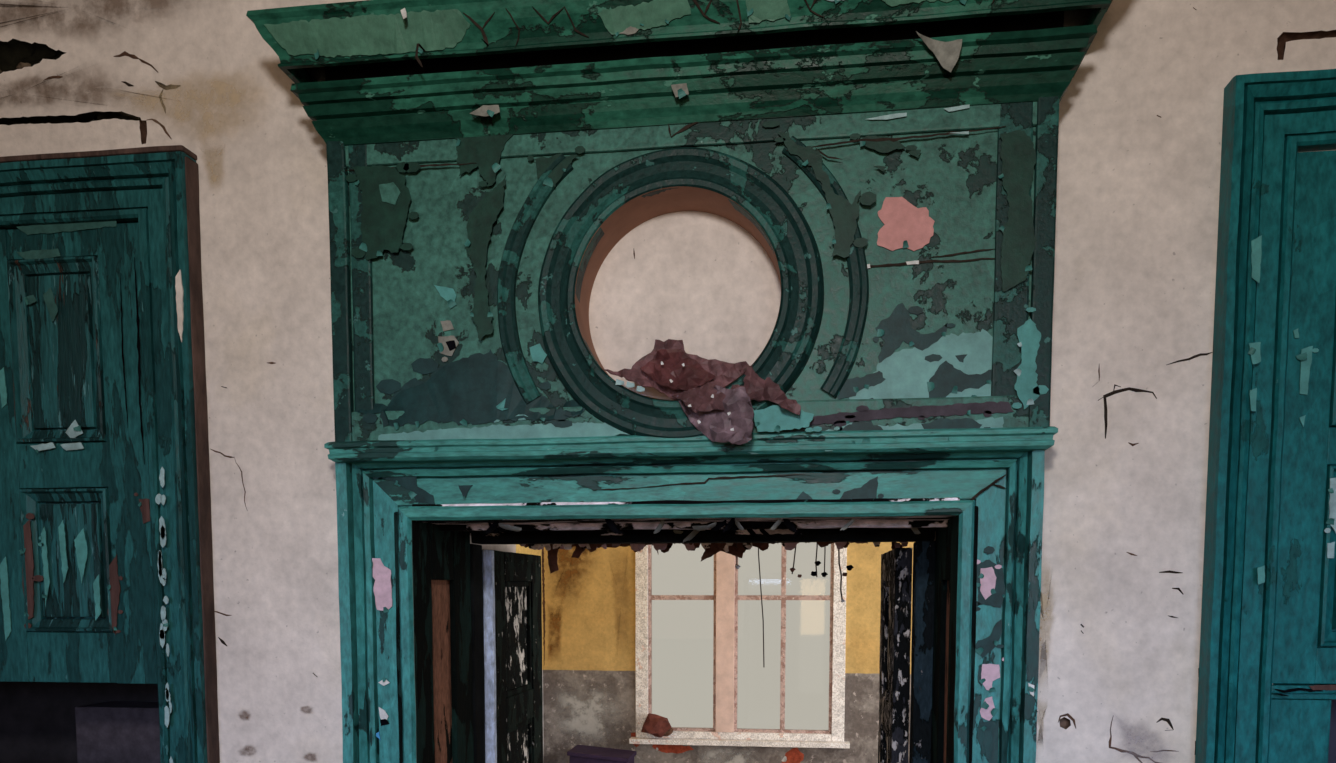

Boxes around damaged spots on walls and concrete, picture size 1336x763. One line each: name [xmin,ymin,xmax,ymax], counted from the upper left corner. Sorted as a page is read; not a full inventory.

crack [464,6,588,46]
crack [693,0,742,30]
flaking render [0,39,66,74]
peeling [762,113,935,265]
peeling [357,134,630,452]
peeling [753,303,1049,445]
crack [1096,352,1213,446]
peeling [468,518,920,578]
water stain [549,613,561,654]
peeling [975,546,1005,731]
crack [1037,711,1076,728]
crack [1109,715,1196,763]